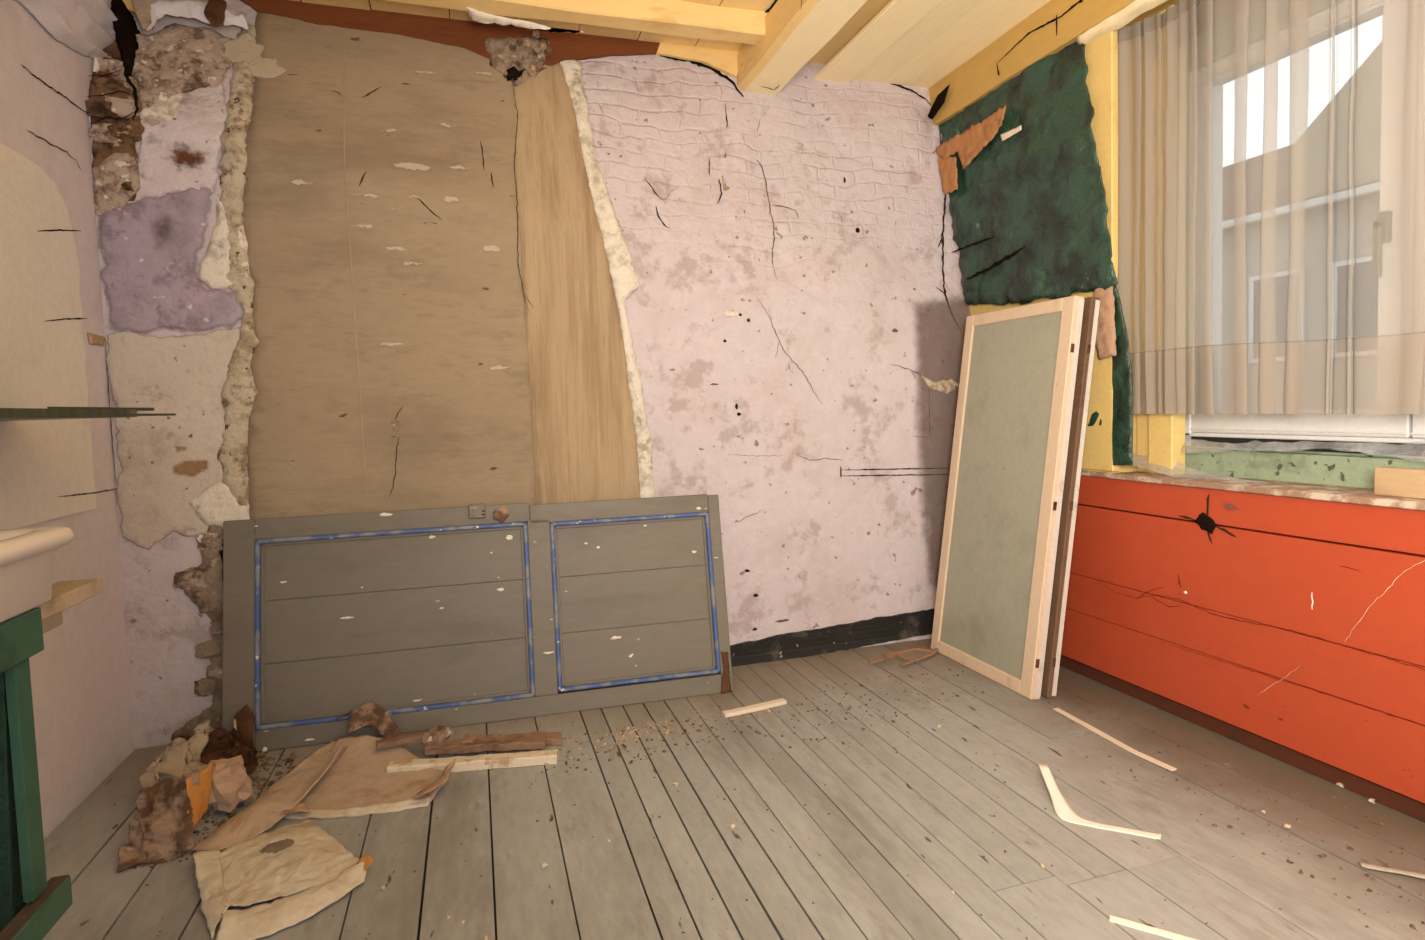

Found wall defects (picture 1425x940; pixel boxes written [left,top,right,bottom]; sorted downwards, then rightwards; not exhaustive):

flaking render [85,23,259,697]
flaking render [483,30,656,498]
crack [1099,574,1425,670]
crack [1162,642,1425,726]